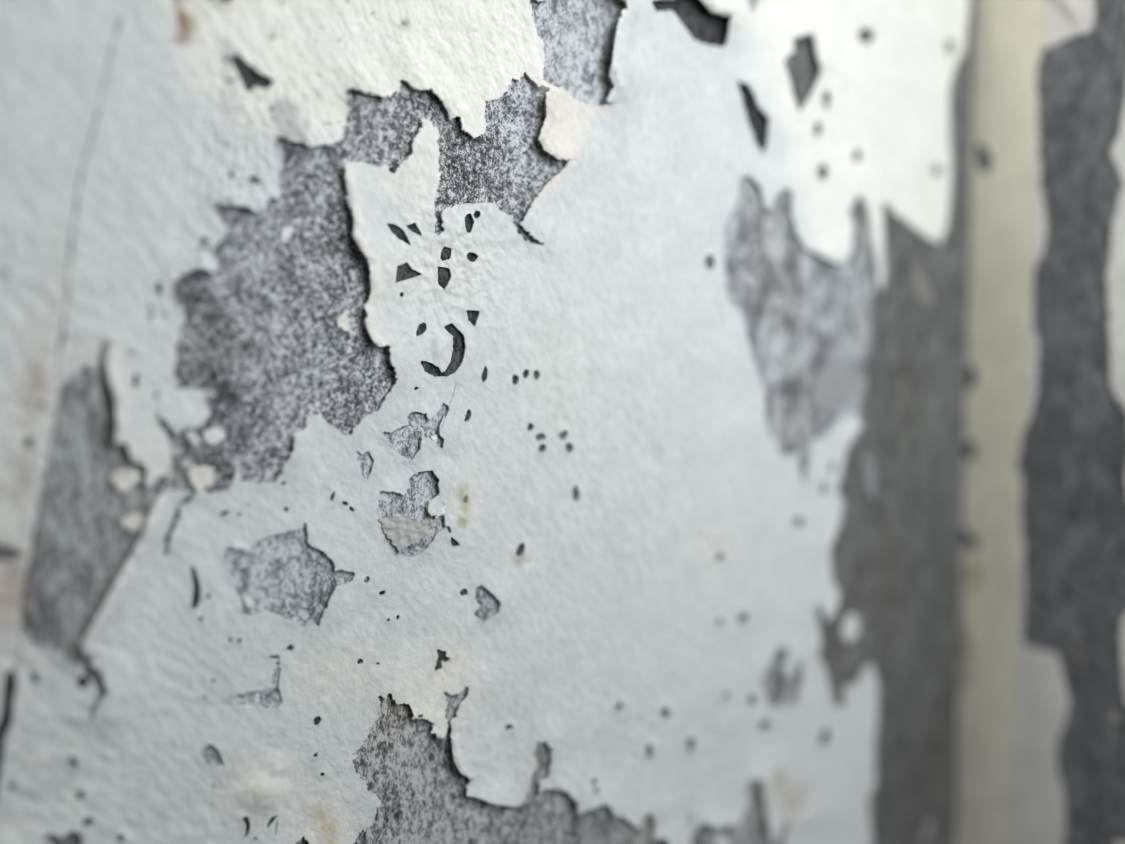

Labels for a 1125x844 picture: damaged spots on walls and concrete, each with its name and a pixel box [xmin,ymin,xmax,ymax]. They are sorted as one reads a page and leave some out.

peeling [45,817,94,844]
peeling [20,0,644,721]
peeling [352,686,668,844]
peeling [687,779,790,844]
peeling [705,0,993,844]
peeling [1014,0,1125,844]